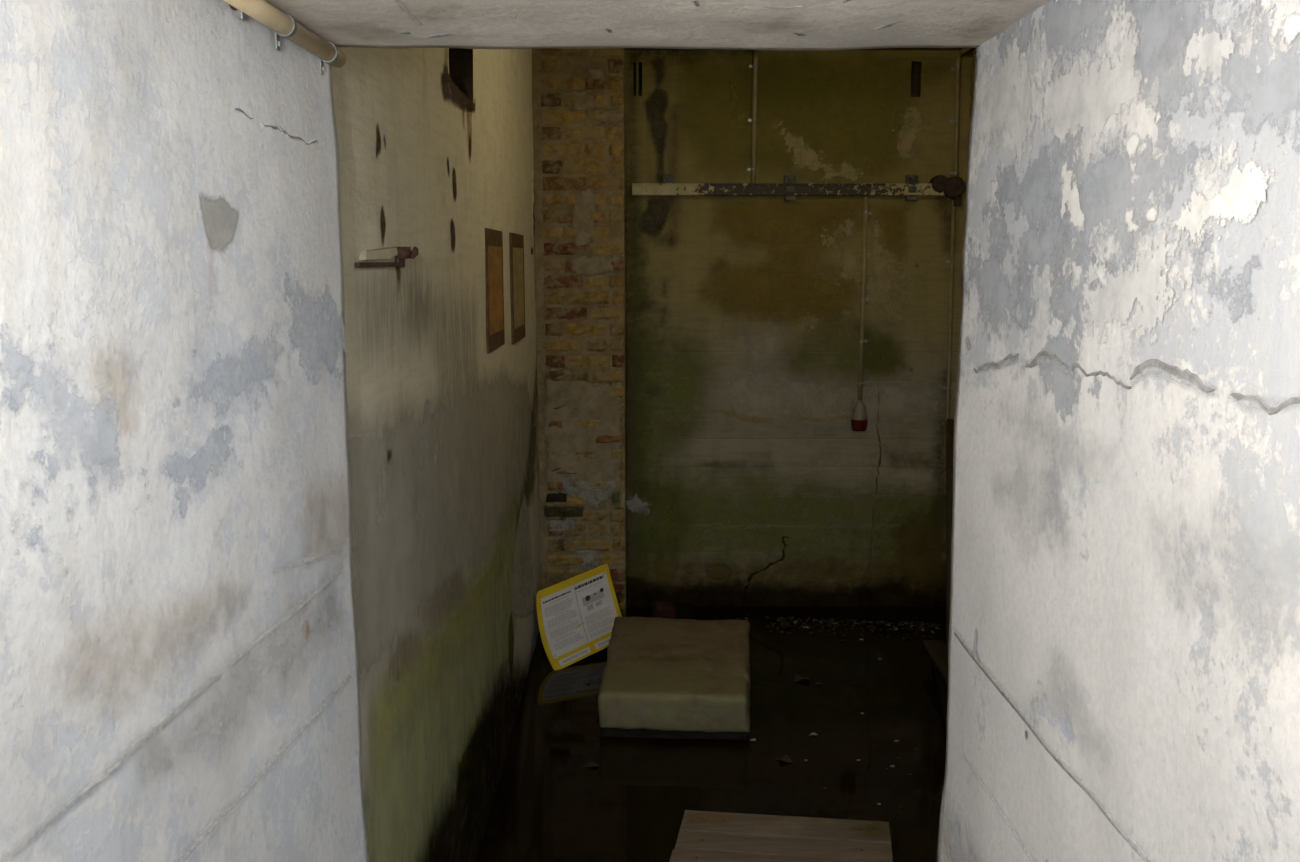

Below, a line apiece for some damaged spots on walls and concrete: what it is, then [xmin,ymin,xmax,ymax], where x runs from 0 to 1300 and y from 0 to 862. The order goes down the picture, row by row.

crack [234,107,319,146]
leakage [632,50,925,182]
peeling [775,121,864,183]
leakage [968,57,976,144]
peeling [965,0,1300,421]
leakage [616,198,946,608]
crack [973,350,1300,415]
crack [742,382,882,607]
leakage [421,659,532,862]